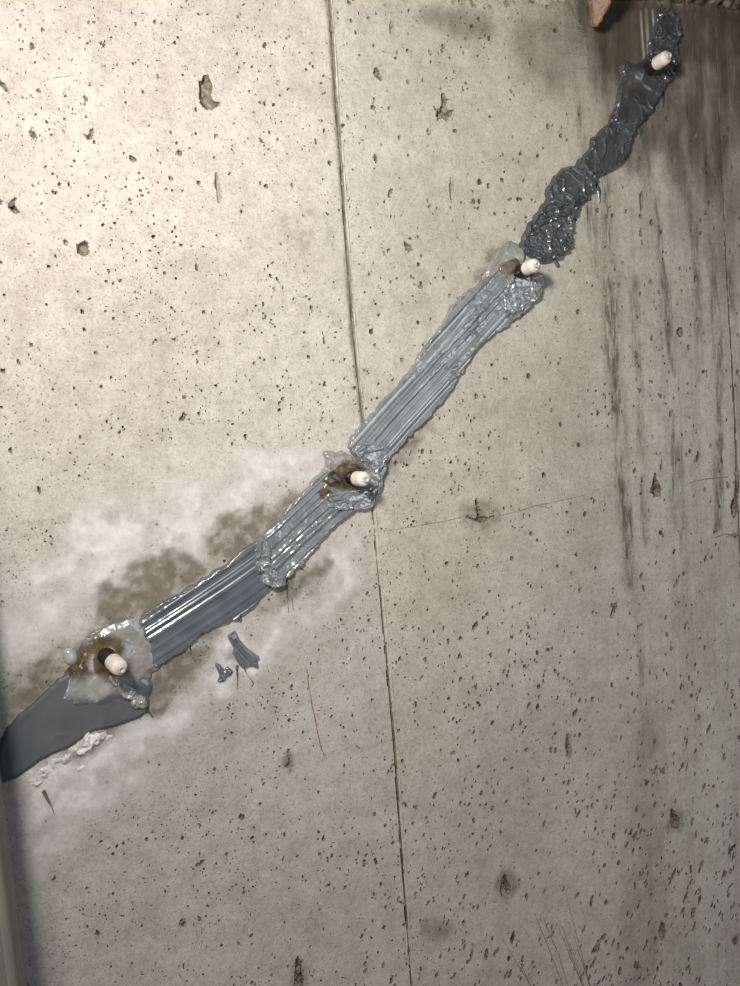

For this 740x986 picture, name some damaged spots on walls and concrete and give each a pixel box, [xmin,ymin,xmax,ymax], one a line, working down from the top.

leakage [577,0,740,167]
crack [0,0,686,783]
leakage [605,298,620,415]
leakage [29,452,304,623]
leakage [279,550,353,615]
leakage [619,464,632,530]
leakage [16,659,51,708]
leakage [25,649,204,824]
leakage [206,624,282,699]